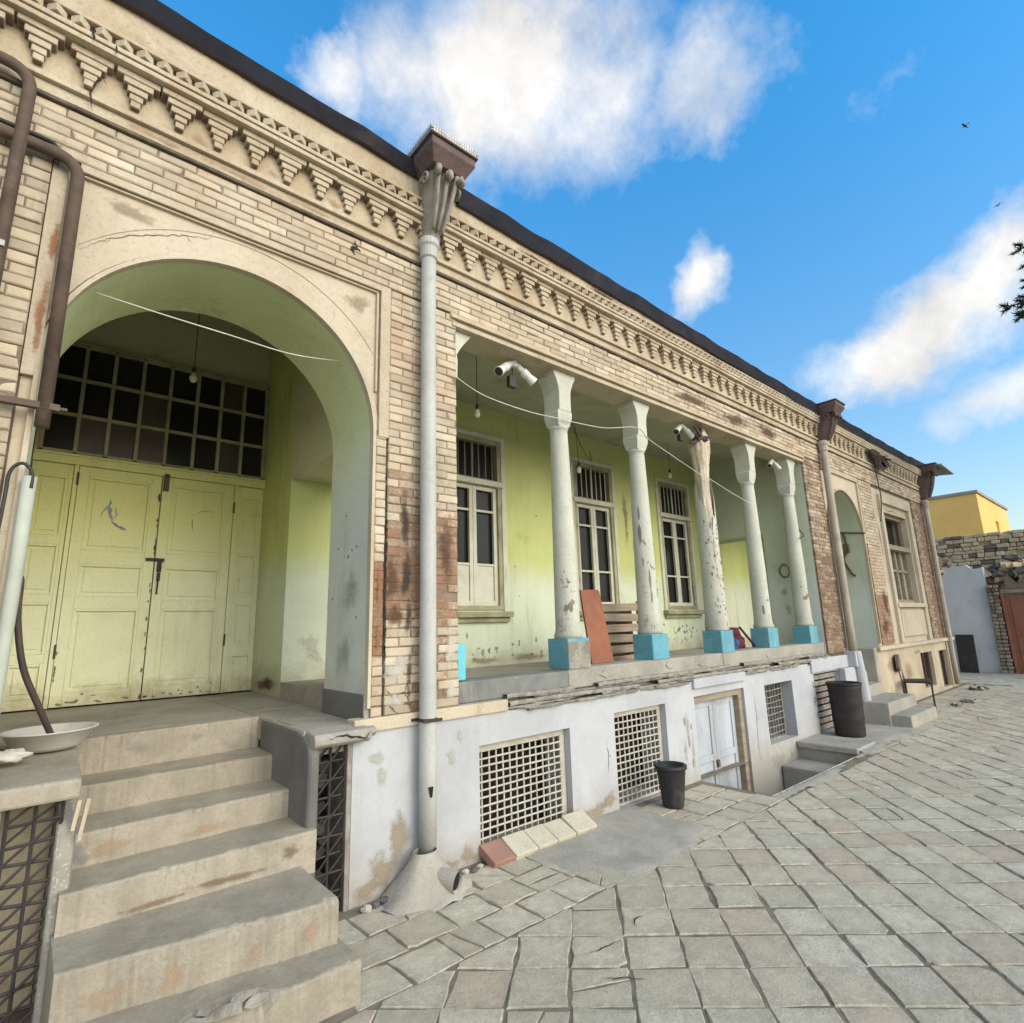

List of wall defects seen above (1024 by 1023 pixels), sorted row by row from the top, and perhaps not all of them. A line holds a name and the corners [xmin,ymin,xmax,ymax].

corrosion [49,229,59,255]
crack [84,234,205,248]
corrosion [34,287,47,348]
peeling [101,500,127,531]
damp [386,555,411,630]
damp [441,529,452,571]
peeling [703,520,728,626]
damp [359,818,406,899]